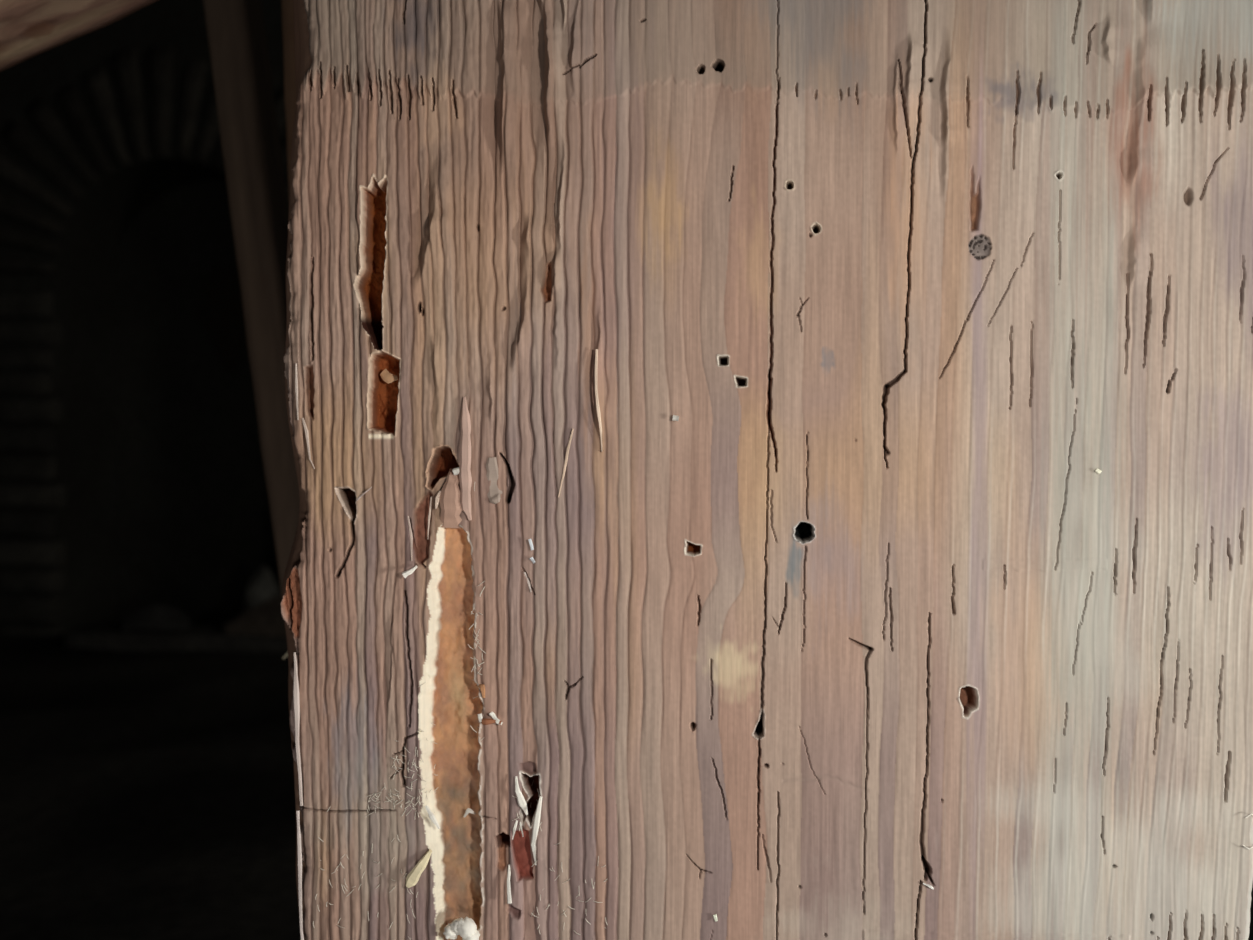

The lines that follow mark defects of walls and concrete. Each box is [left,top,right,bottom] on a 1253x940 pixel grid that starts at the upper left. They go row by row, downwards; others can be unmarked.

crack [1071,0,1097,65]
crack [711,1,809,940]
crack [881,0,928,469]
crack [938,189,1062,410]
crack [1053,319,1079,571]
crack [1124,253,1178,395]
crack [694,595,702,628]
crack [848,542,893,915]
crack [914,564,956,940]
crack [1052,517,1138,796]
crack [1099,816,1107,855]
crack [1153,508,1244,803]